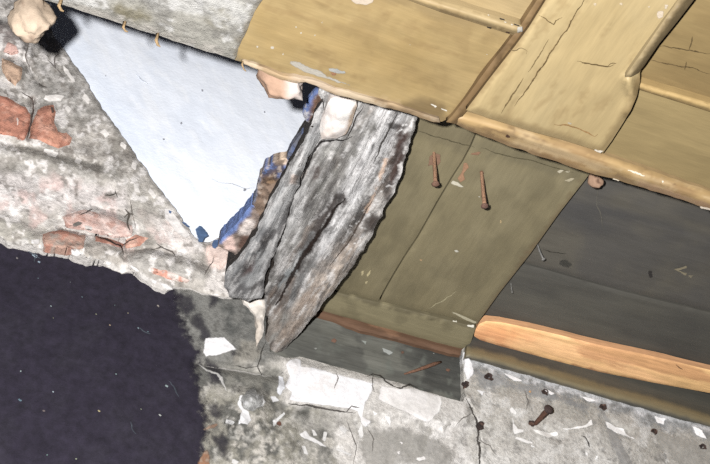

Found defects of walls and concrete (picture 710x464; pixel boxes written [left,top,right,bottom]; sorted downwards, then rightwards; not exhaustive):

crack [501,0,584,113]
crack [653,39,708,74]
spalling [0,92,72,157]
spalling [31,209,148,256]
crack [97,191,138,254]
crack [367,373,416,392]
crack [457,396,498,464]